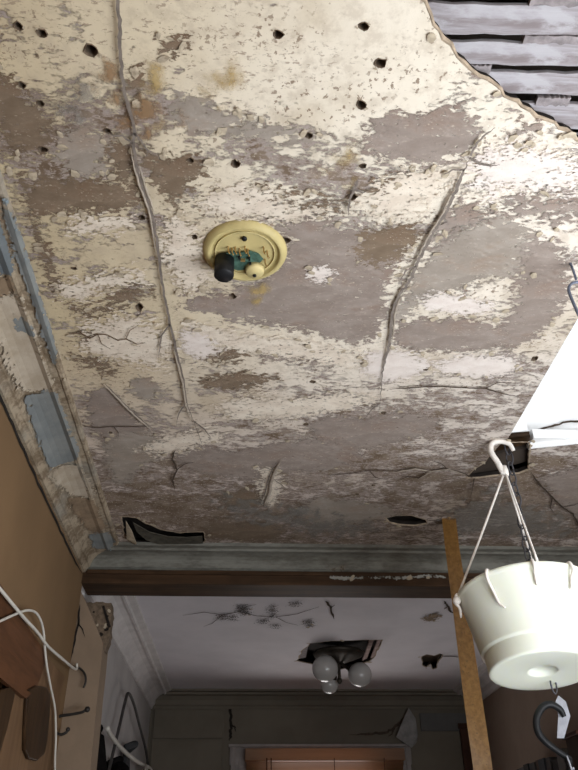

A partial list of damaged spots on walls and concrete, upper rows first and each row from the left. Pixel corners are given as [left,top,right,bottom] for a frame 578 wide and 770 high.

spalling [83,43,102,58]
peeling [152,25,194,67]
spalling [421,0,578,152]
crack [70,0,209,443]
peeling [0,58,370,511]
crack [367,128,519,415]
crack [171,450,193,489]
leakage [436,485,577,538]
crack [531,473,578,525]
crack [188,601,334,626]
spalling [294,640,383,664]
spalling [418,654,443,669]